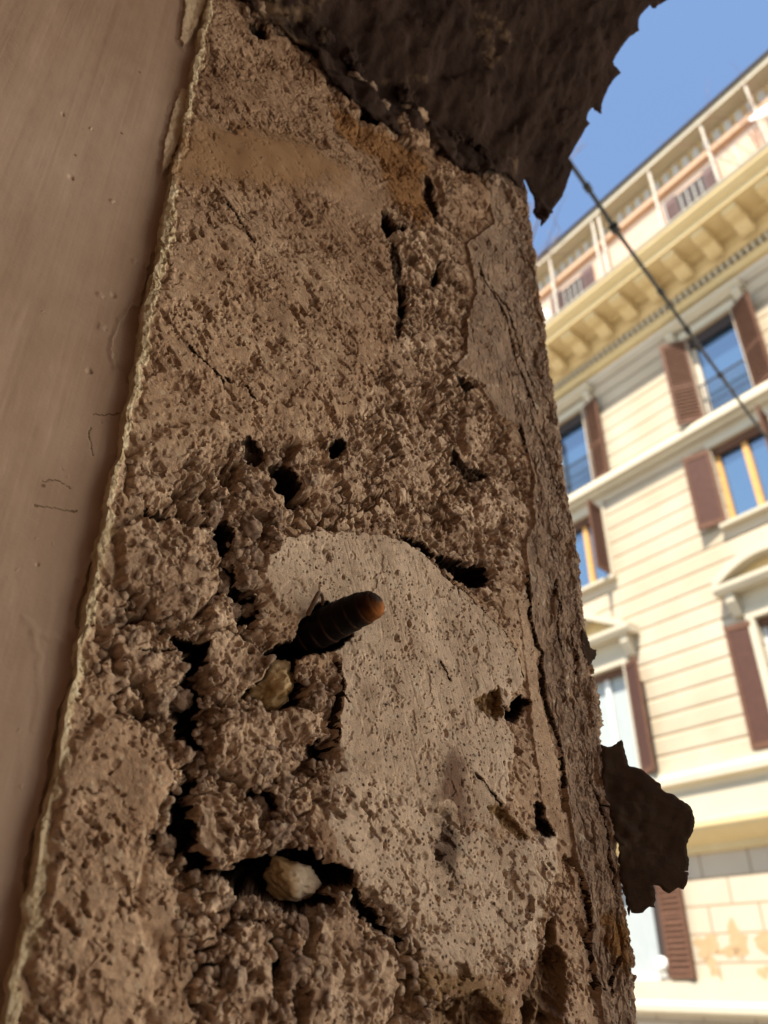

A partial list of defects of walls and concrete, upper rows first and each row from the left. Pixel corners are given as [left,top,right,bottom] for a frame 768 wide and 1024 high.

peeling [180,0,207,44]
peeling [162,88,187,173]
peeling [240,0,666,226]
spalling [75,175,532,1024]
crack [326,660,350,744]
peeling [39,709,60,814]
spalling [486,801,556,841]
crack [427,557,620,993]